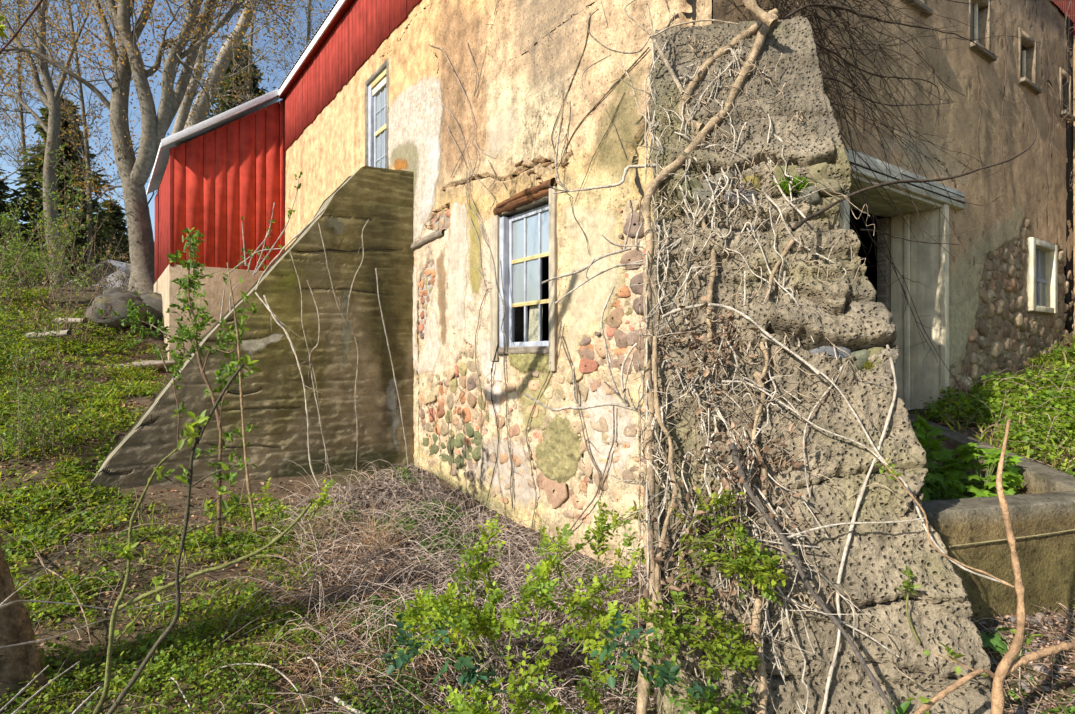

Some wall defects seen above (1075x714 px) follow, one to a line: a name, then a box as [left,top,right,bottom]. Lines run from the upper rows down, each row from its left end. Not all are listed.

crack [666,0,697,28]
crack [292,215,400,252]
crack [424,150,573,230]
crack [348,277,421,385]
flaking render [418,197,652,524]
flaking render [949,219,1075,396]